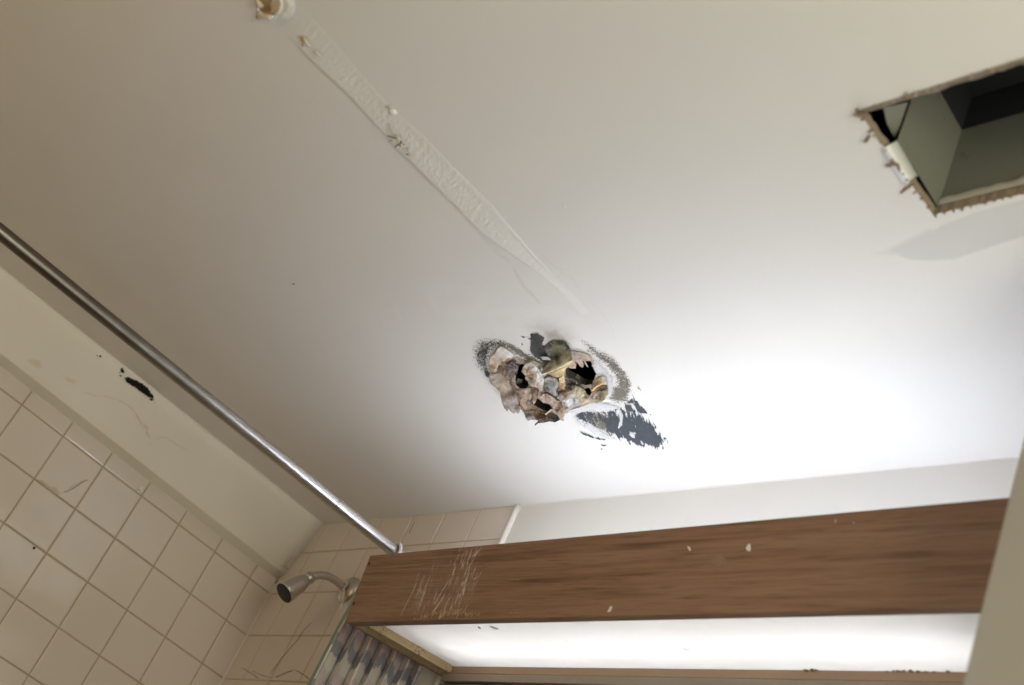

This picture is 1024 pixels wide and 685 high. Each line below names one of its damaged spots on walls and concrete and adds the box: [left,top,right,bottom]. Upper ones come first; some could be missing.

leakage [119,368,154,401]
spalling [489,341,644,445]